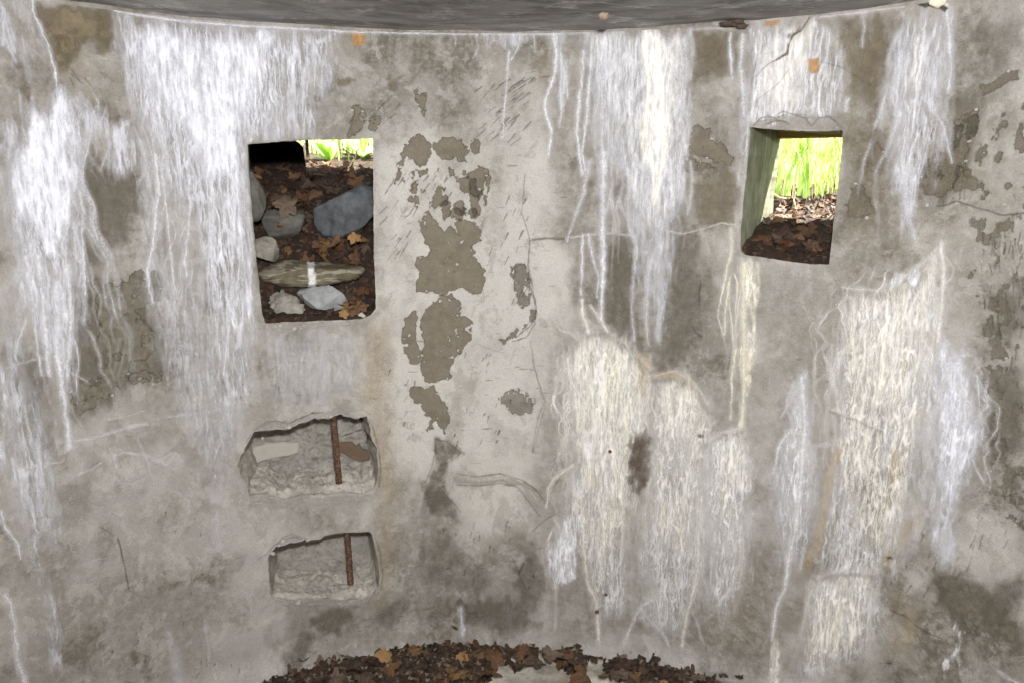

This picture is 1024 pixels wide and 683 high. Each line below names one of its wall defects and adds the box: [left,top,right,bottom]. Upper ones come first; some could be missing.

peeling [980,69,1018,95]
peeling [681,125,734,173]
peeling [915,106,1024,207]
water stain [7,0,351,450]
peeling [386,134,491,437]
peeling [500,264,536,345]
water stain [460,4,976,683]
peeling [971,216,1023,272]
water stain [0,372,47,527]
spalling [258,411,343,484]
water stain [803,242,1023,679]
spalling [344,533,354,585]